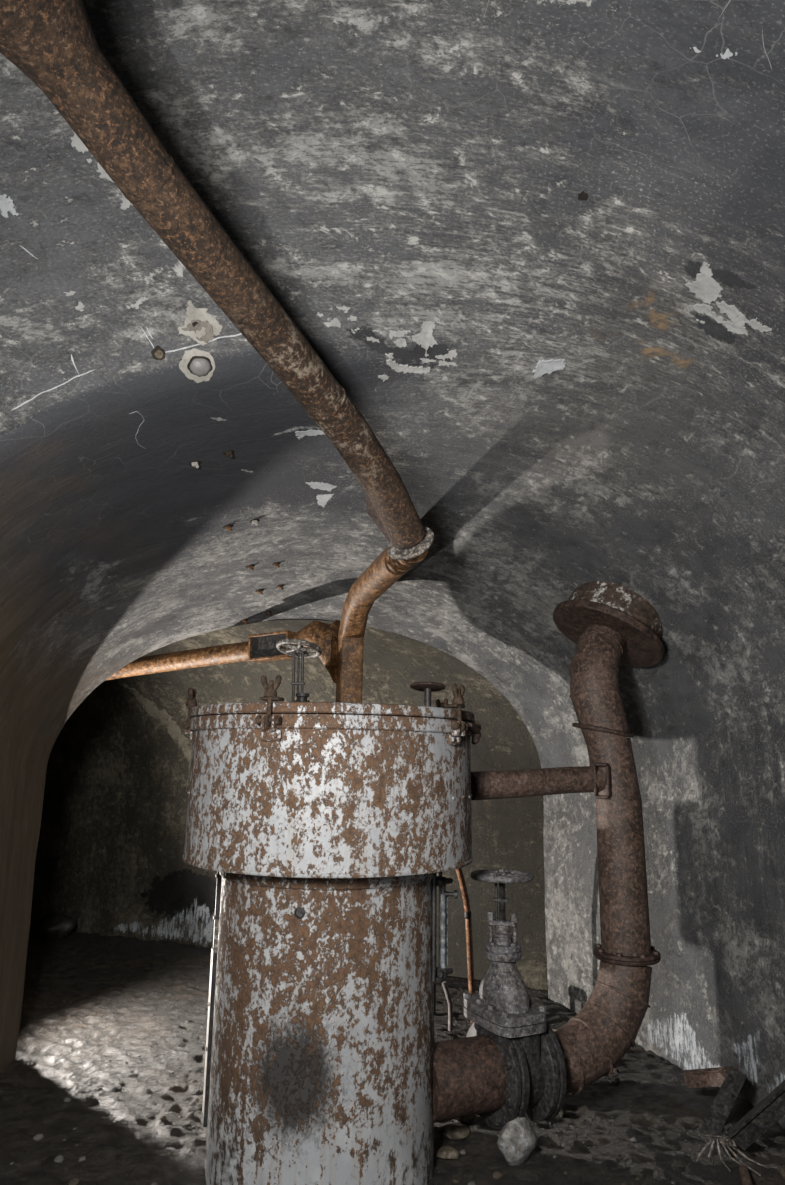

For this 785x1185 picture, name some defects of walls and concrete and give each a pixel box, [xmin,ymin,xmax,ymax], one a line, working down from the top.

peeling [66,133,114,183]
peeling [0,194,20,219]
spalling [178,300,223,346]
peeling [317,306,459,382]
peeling [685,261,772,344]
peeling [306,482,337,507]